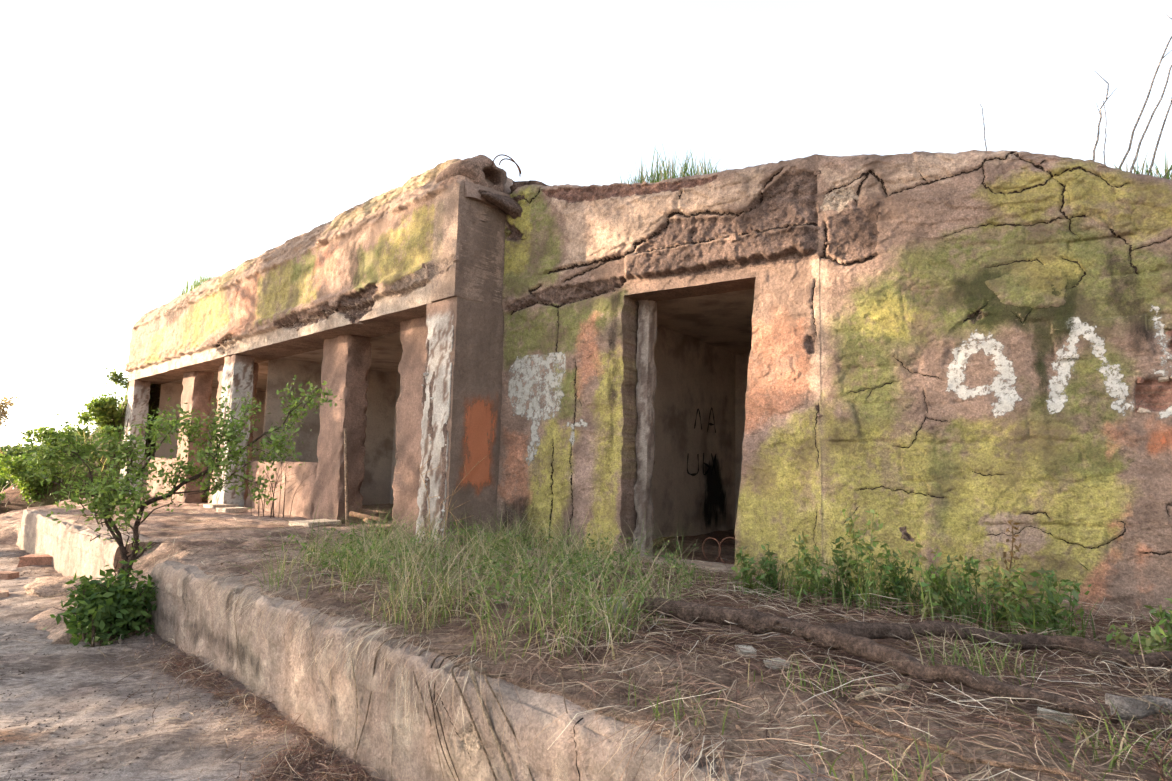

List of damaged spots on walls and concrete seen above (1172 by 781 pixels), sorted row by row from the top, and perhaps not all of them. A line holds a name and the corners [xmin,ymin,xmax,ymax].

spalling [504,169,880,311]
crack [826,151,1171,288]
spalling [273,255,459,331]
rust [460,399,497,492]
crack [511,170,875,546]
crack [849,358,948,448]
water stain [958,270,1077,395]
spalling [1135,376,1172,413]
crack [986,512,1172,555]